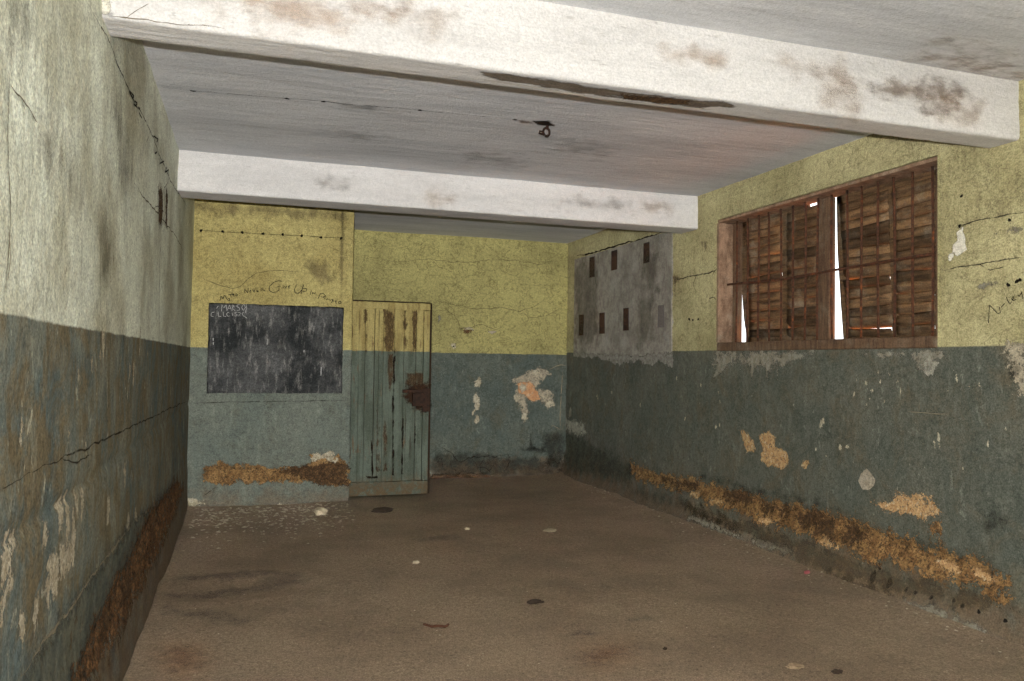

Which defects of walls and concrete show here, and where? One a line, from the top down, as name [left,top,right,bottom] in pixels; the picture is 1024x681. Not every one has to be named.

crack [89,4,342,245]
peeling [948,227,967,261]
peeling [471,377,482,424]
peeling [512,364,565,429]
crack [5,402,184,488]
flaking render [201,451,351,488]
peeling [739,429,817,470]
flaking render [629,458,1016,623]